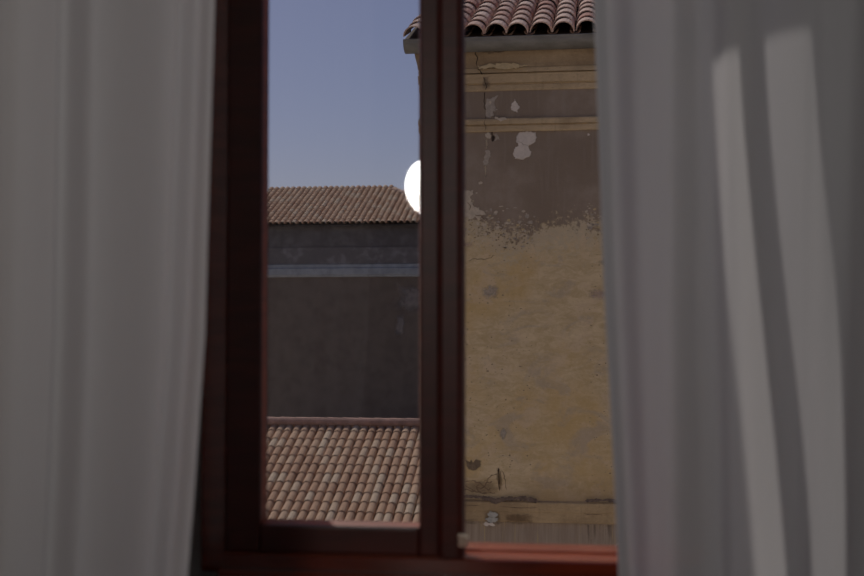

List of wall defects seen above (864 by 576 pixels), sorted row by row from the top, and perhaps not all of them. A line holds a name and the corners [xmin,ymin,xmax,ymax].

spalling [485,95,520,121]
peeling [465,131,537,252]